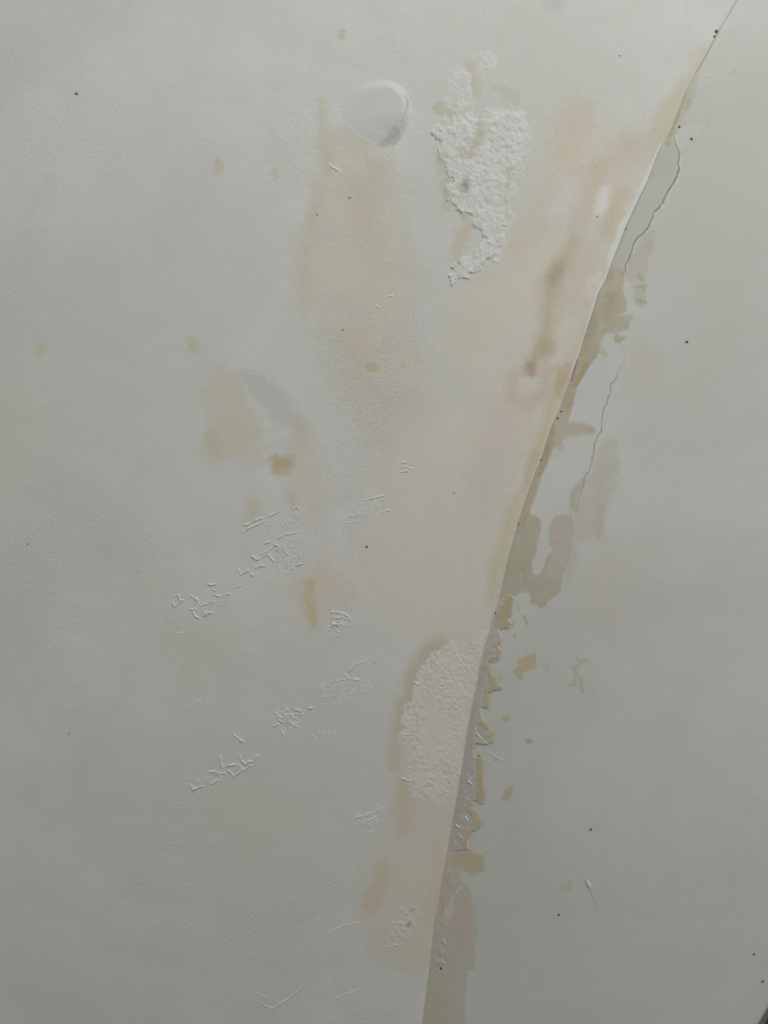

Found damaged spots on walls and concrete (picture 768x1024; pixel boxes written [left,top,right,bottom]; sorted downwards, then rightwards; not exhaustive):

flaking render [430,49,530,288]
peeling [169,531,308,635]
leakage [201,372,329,527]
leakage [286,48,709,1024]
peeling [447,138,666,852]
crack [576,366,622,513]